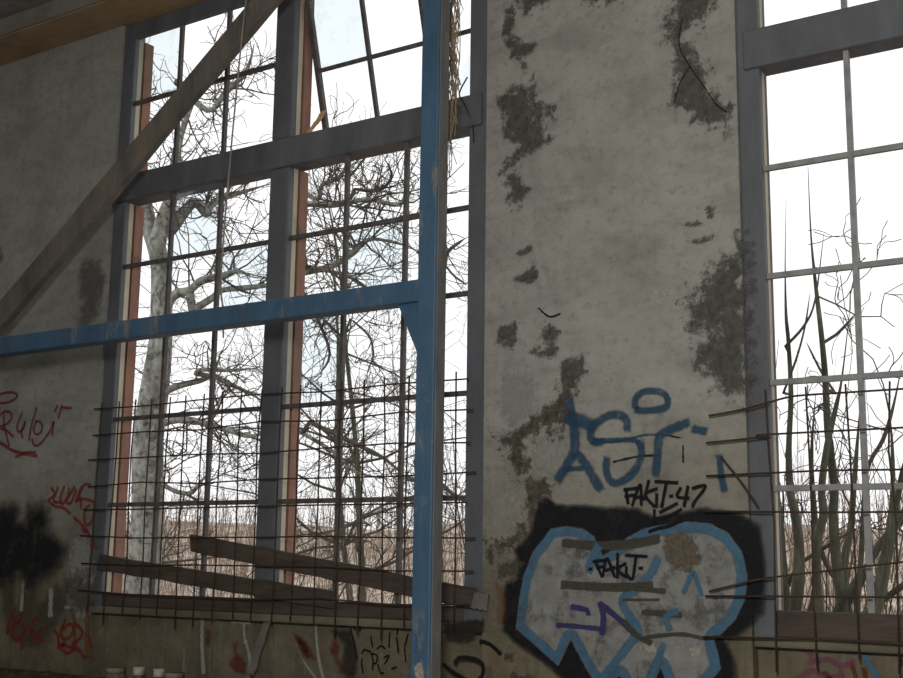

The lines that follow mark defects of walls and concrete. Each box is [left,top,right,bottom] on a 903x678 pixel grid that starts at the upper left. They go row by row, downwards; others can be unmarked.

flaking render [496,0,557,210]
flaking render [660,0,735,134]
crack [674,19,727,112]
flaking render [675,229,759,413]
flaking render [483,320,588,585]